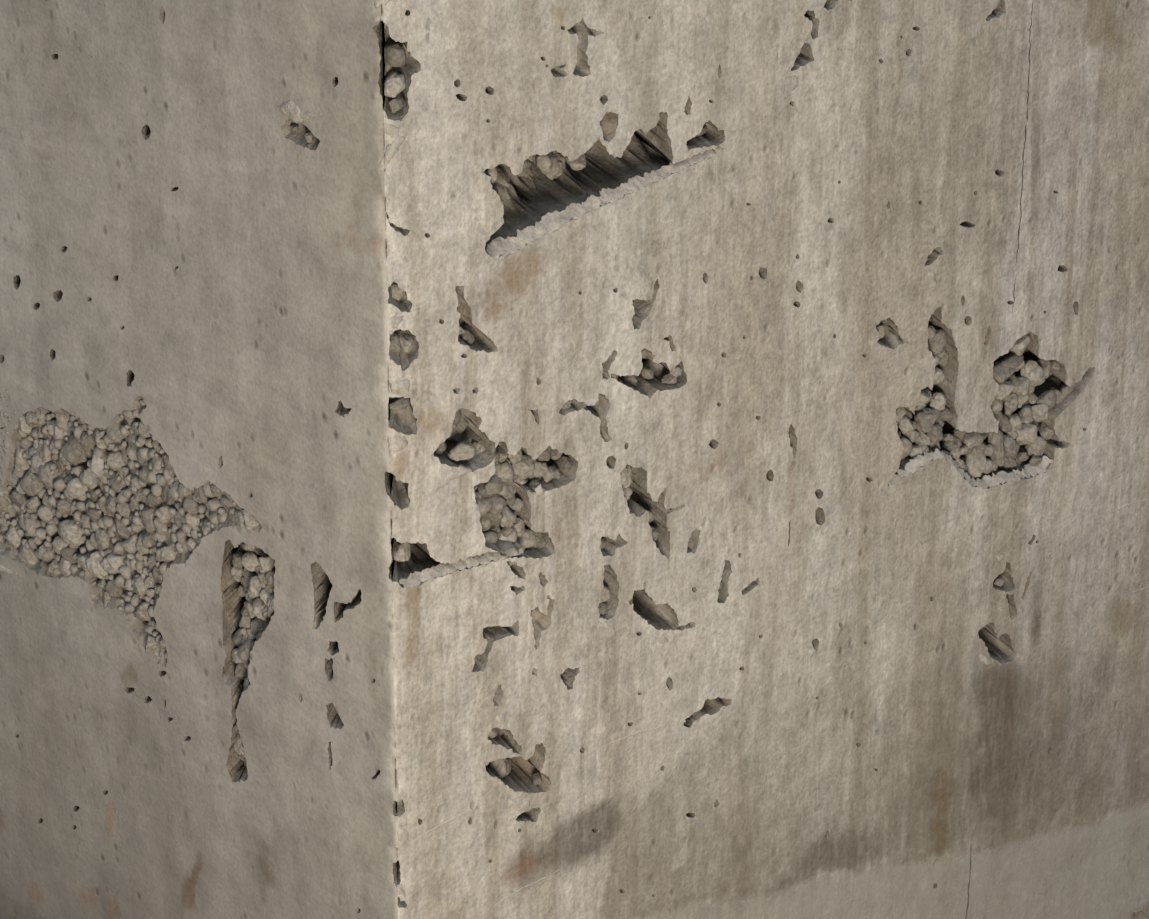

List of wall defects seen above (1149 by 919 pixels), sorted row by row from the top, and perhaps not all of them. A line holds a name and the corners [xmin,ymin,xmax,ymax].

peeling [373,0,421,171]
spalling [483,112,726,259]
peeling [433,466,473,492]